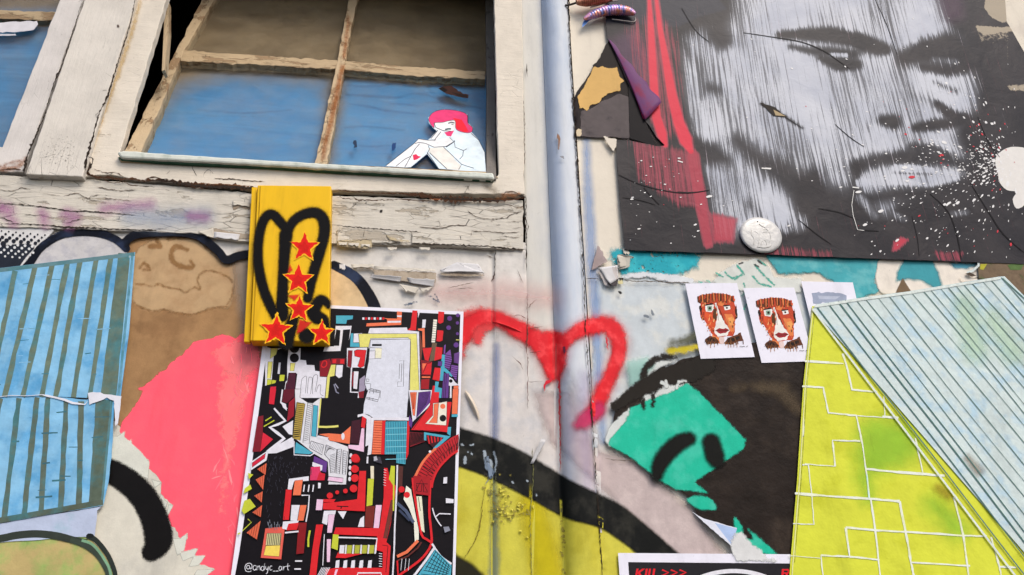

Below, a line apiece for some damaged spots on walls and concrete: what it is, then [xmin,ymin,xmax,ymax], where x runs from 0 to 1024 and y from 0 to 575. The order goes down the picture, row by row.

corrosion [323,25,348,155]
peeling [232,201,250,210]
peeling [199,228,249,240]
peeling [337,239,372,249]
peeling [339,262,485,306]